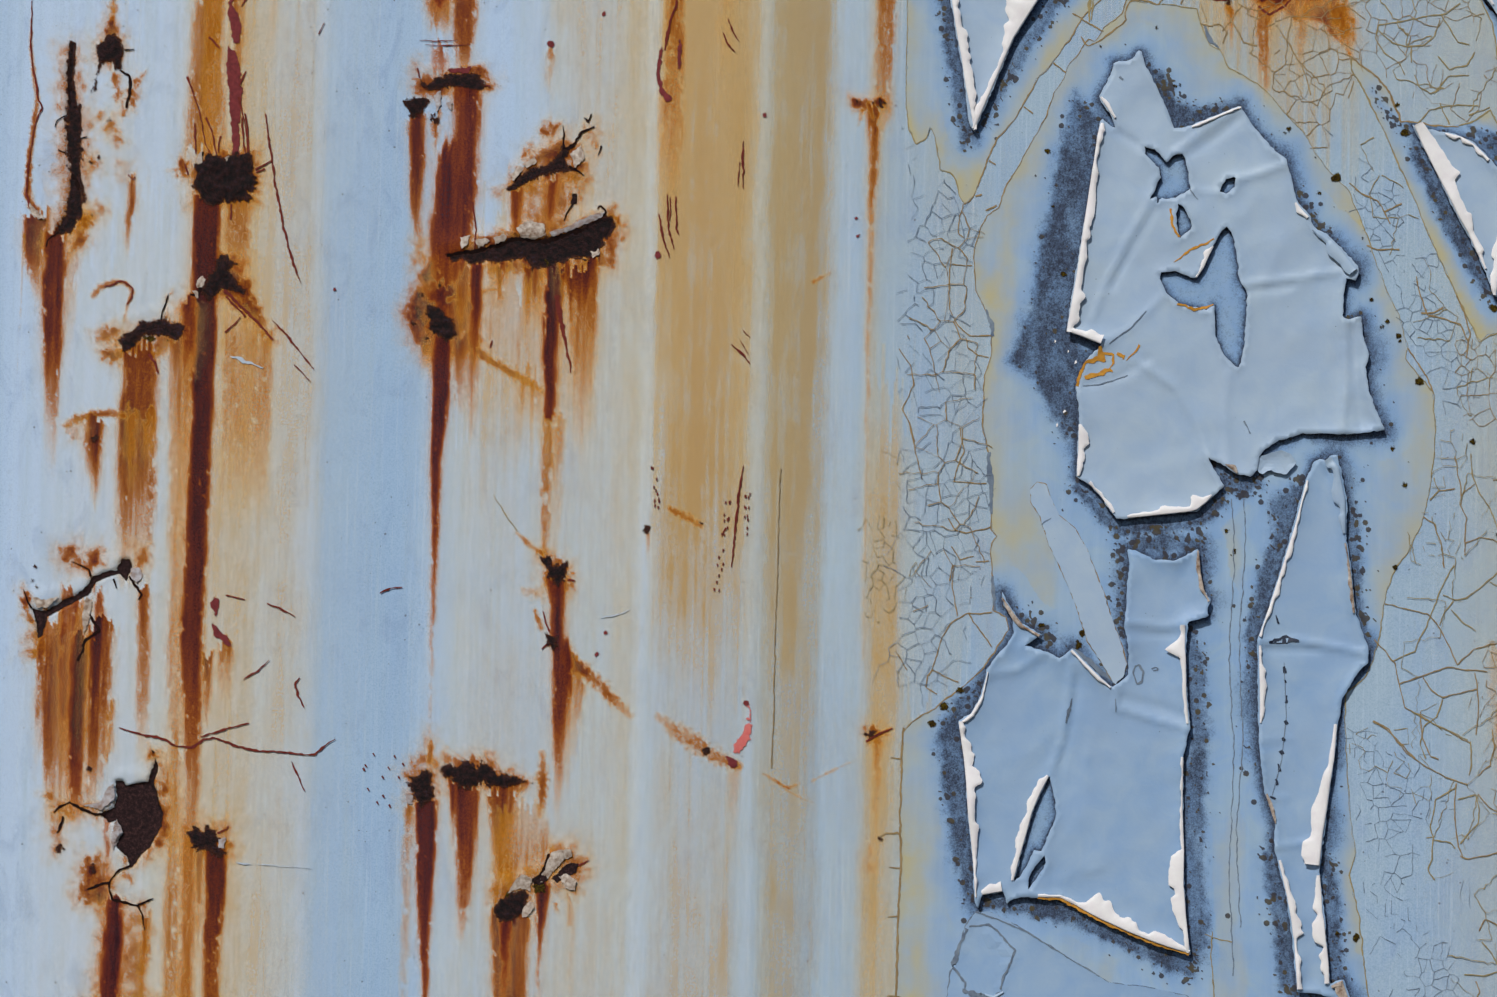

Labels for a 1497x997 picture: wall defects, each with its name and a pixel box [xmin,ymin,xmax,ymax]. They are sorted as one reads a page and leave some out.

rust [125,174,136,238]
rust [422,0,478,68]
rust [850,0,895,237]
rust [1256,0,1355,86]
peeling [1350,56,1497,342]
peeling [1481,0,1497,56]
rust [163,0,276,997]
rust [400,256,542,648]
rust [362,496,628,997]
crack [857,128,997,997]
peeling [896,0,1436,997]
crack [1053,0,1497,997]